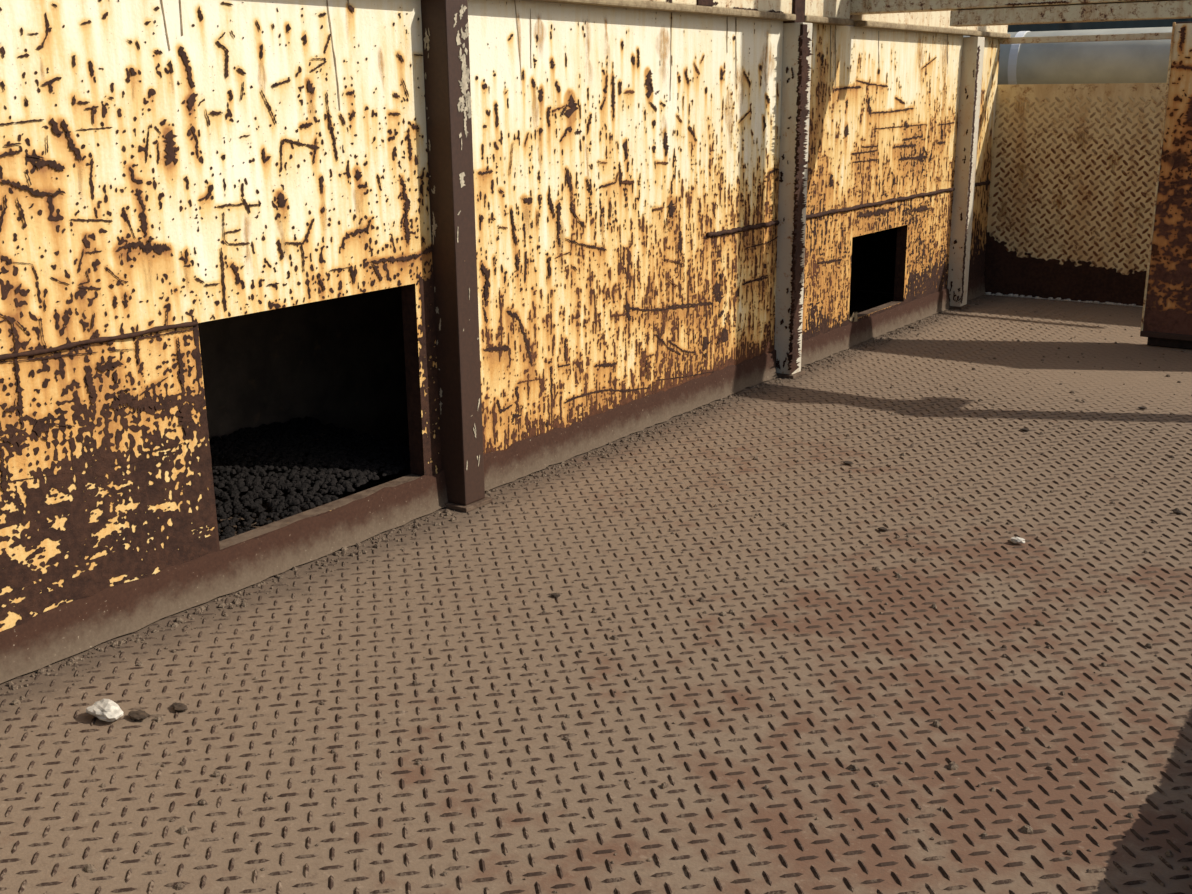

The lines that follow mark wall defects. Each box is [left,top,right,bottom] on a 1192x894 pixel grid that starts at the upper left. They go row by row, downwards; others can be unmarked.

corrosion [561,94,579,117]
corrosion [646,31,668,98]
corrosion [116,238,171,259]
corrosion [371,176,433,264]
peeling [476,24,995,455]
corrosion [783,0,914,375]
corrosion [984,232,1147,306]
corrosion [12,322,24,429]
corrosion [110,388,165,413]
peeling [0,6,442,628]
corrosion [507,310,538,366]
corrosion [629,272,741,357]